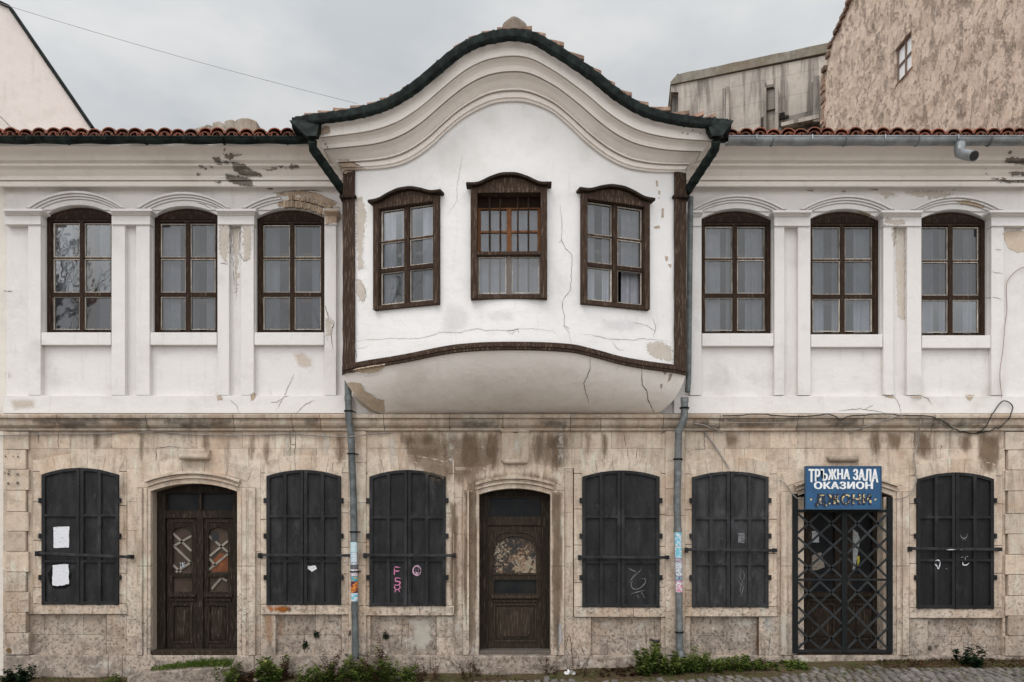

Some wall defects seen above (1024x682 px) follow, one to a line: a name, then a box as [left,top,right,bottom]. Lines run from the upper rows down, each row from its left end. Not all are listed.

flaking render [196,148,341,225]
spalling [985,151,1024,184]
flaking render [218,225,252,296]
peeling [355,197,367,301]
peeling [1003,230,1024,253]
crack [325,207,667,402]
crack [270,374,314,454]
flaking render [346,363,385,413]
water stain [918,435,931,456]
water stain [958,422,999,470]
water stain [389,422,499,644]
water stain [536,421,565,650]